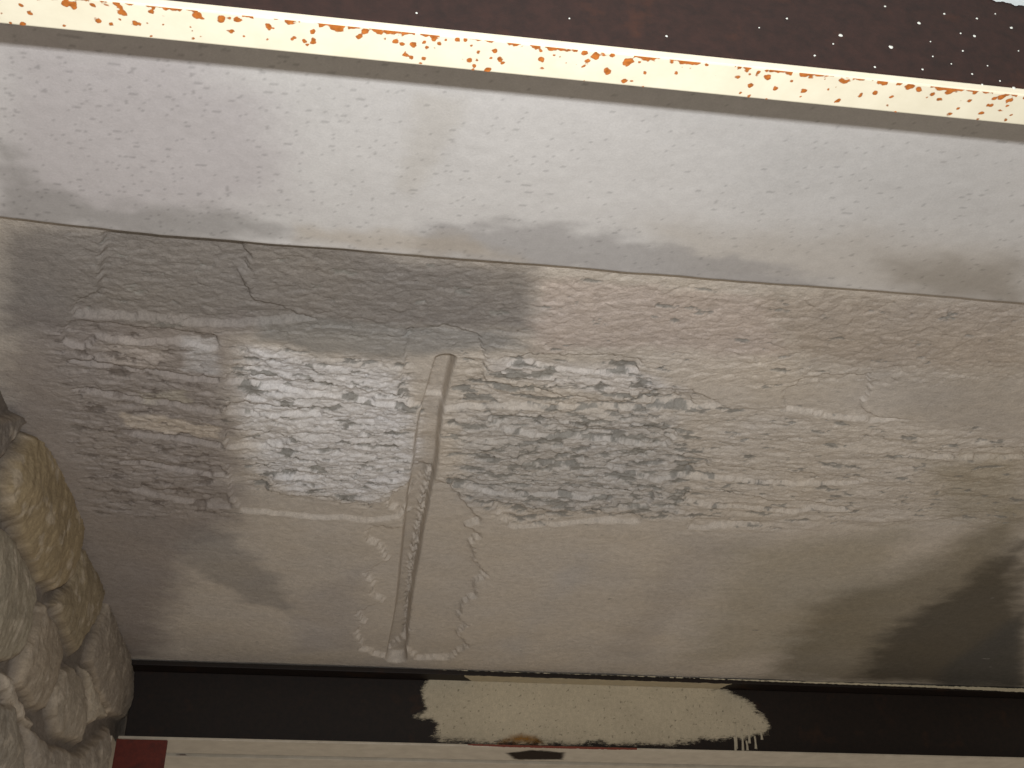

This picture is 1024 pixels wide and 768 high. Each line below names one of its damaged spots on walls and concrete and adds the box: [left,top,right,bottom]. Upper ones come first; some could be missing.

corrosion [61,0,204,39]
corrosion [217,15,708,87]
corrosion [735,66,1024,121]